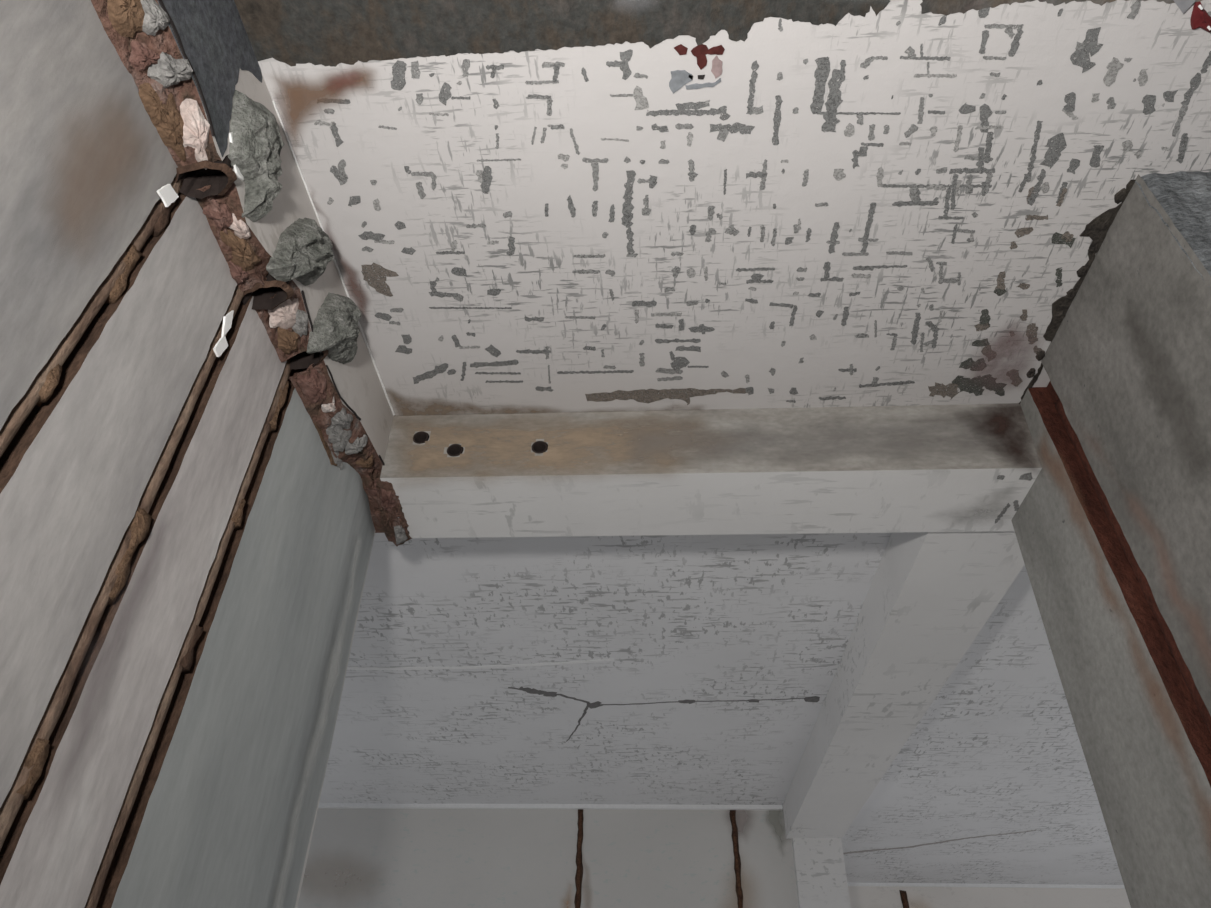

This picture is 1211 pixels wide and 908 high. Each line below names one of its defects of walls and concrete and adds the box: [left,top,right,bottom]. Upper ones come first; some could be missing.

peeling [920,0,1175,77]
peeling [1062,92,1078,120]
peeling [1070,27,1211,164]
peeling [877,93,1006,244]
rust [150,199,175,237]
peeling [91,0,961,546]
peeling [839,121,1136,404]
rust [36,357,62,407]
peeling [995,500,1019,523]
crack [508,687,820,742]